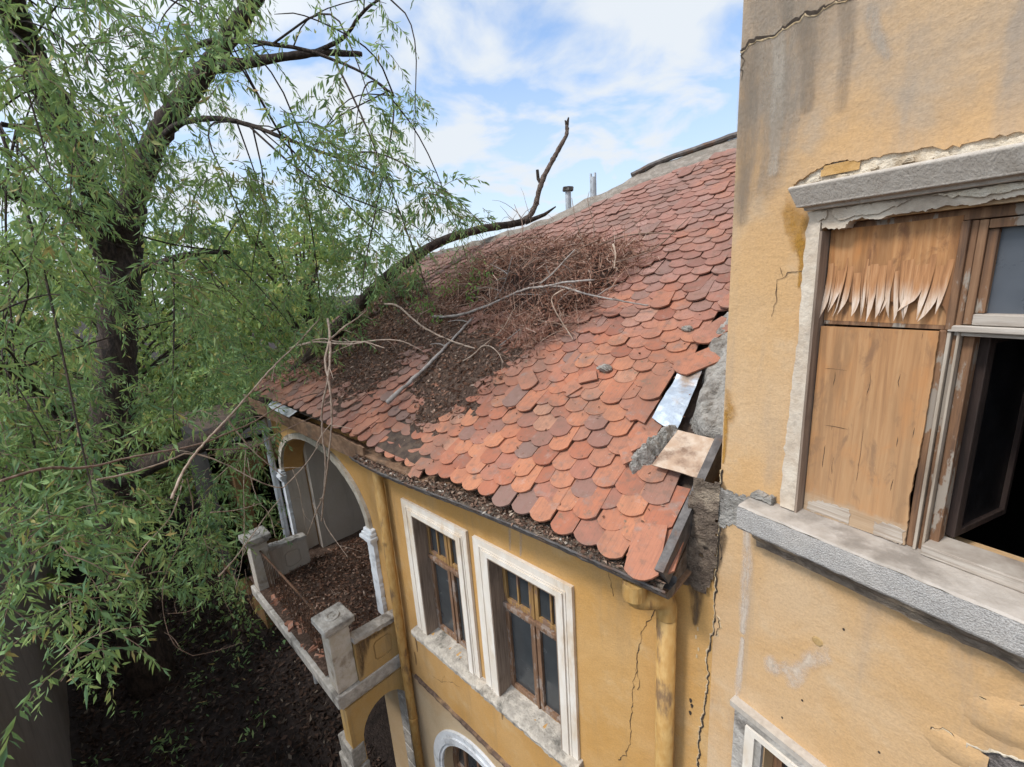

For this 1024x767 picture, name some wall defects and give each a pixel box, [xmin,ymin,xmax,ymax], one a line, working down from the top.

crack [740,0,849,80]
peeling [795,132,1024,186]
peeling [809,181,1024,229]
crack [618,610,655,760]
crack [696,526,722,767]